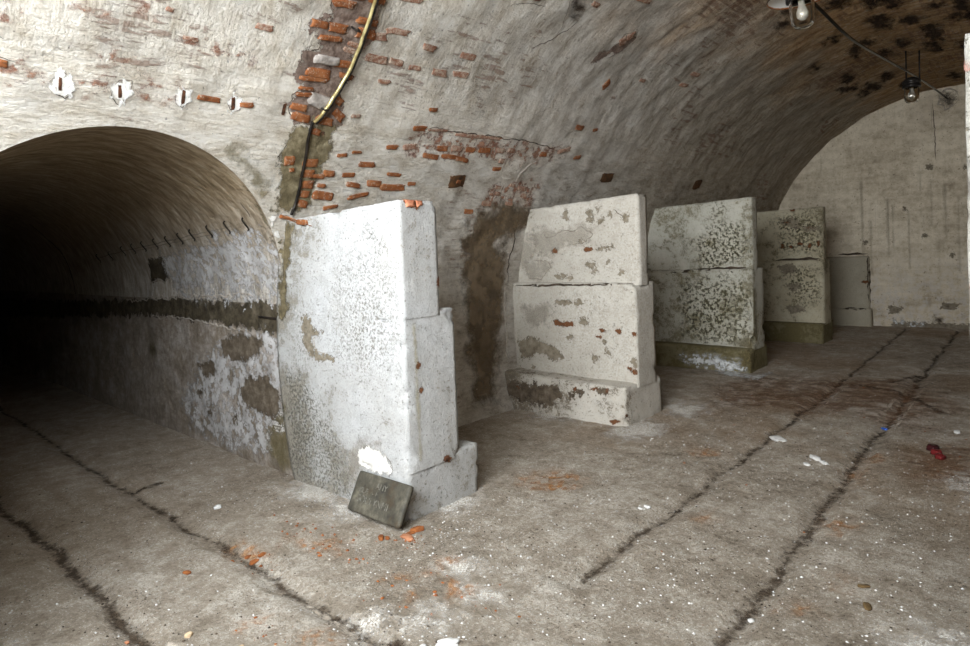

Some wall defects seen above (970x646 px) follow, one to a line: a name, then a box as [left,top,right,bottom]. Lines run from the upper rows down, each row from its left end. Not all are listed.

flaking render [288,0,470,127]
flaking render [459,52,476,61]
crack [930,100,938,158]
flaking render [323,151,423,211]
spalling [448,175,466,188]
flaking render [0,186,311,454]
peeling [301,314,335,363]
damp [460,199,531,402]
flaking render [555,298,589,325]
damp [680,291,765,380]
spalling [507,336,609,409]